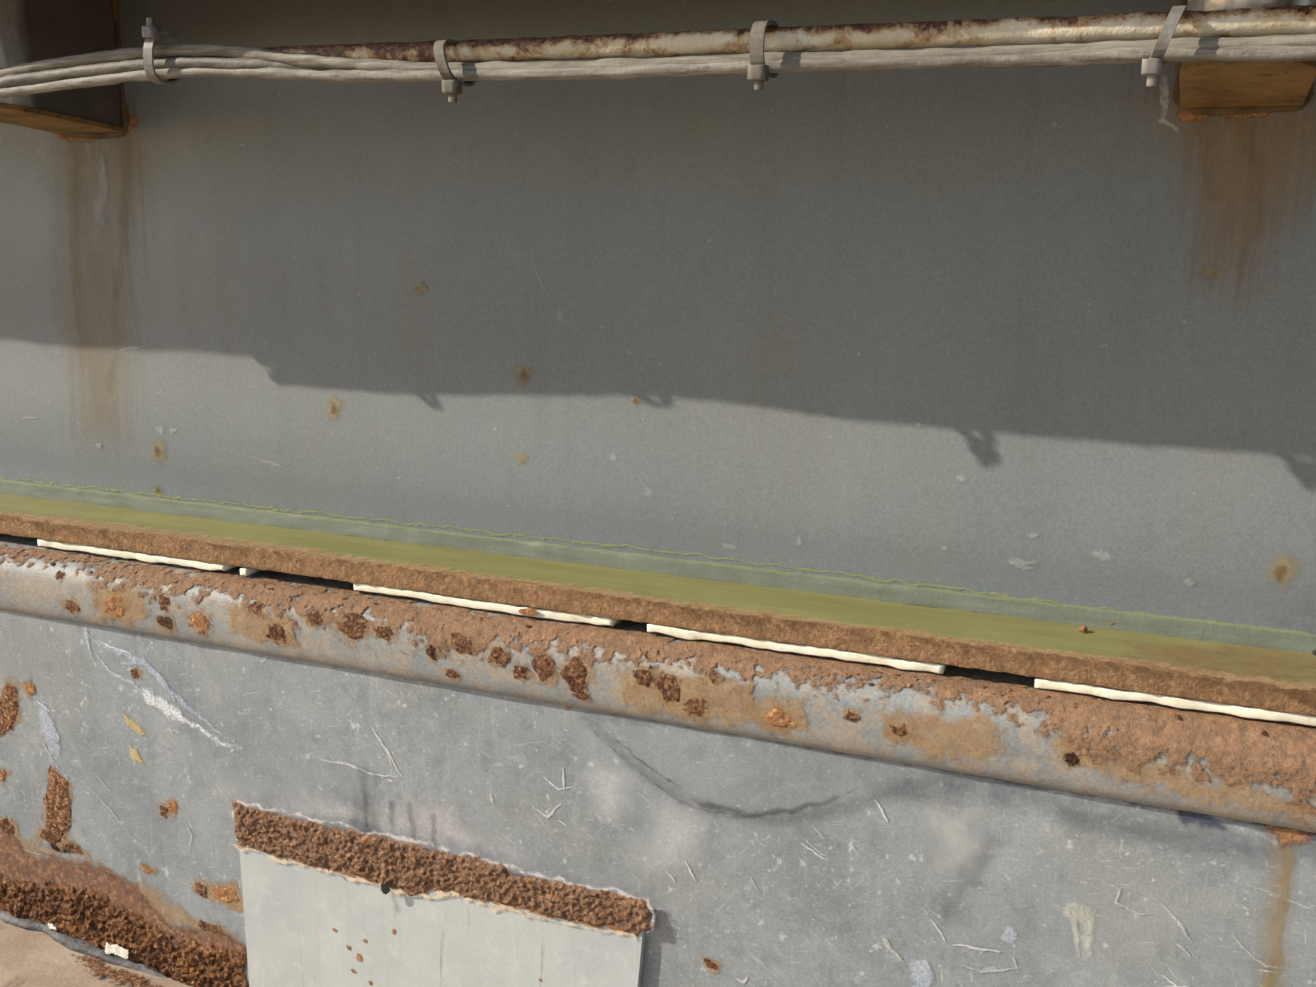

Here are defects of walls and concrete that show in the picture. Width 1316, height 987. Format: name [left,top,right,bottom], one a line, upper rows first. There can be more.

rust [0,511,1316,690]
rust [0,544,1316,847]
rust [0,766,249,987]
rust [702,957,720,975]